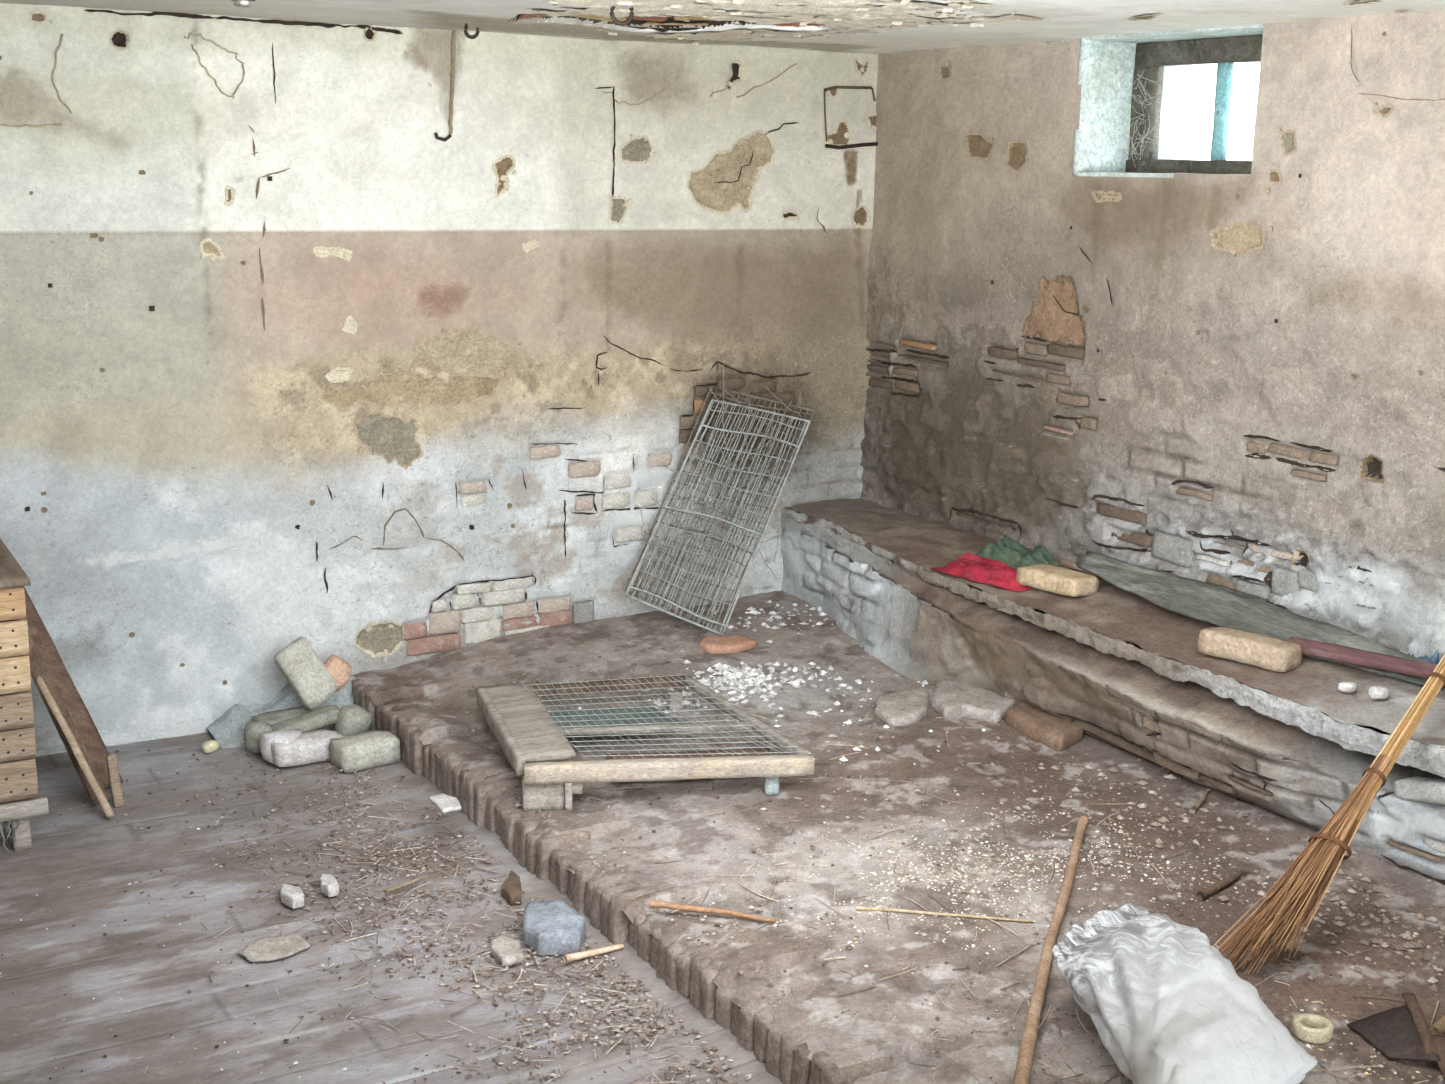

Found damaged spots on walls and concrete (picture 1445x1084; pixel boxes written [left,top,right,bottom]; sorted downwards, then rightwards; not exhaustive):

crack [84,9,403,104]
peeling [512,0,1050,45]
crack [1349,25,1444,101]
crack [594,86,616,196]
flaking render [688,122,798,214]
crack [249,126,290,330]
flaking render [984,274,1106,435]
crack [455,337,811,558]
flaking render [650,377,804,467]
flaking render [1243,434,1339,482]
spalling [1360,454,1384,484]
flaking render [353,576,594,662]